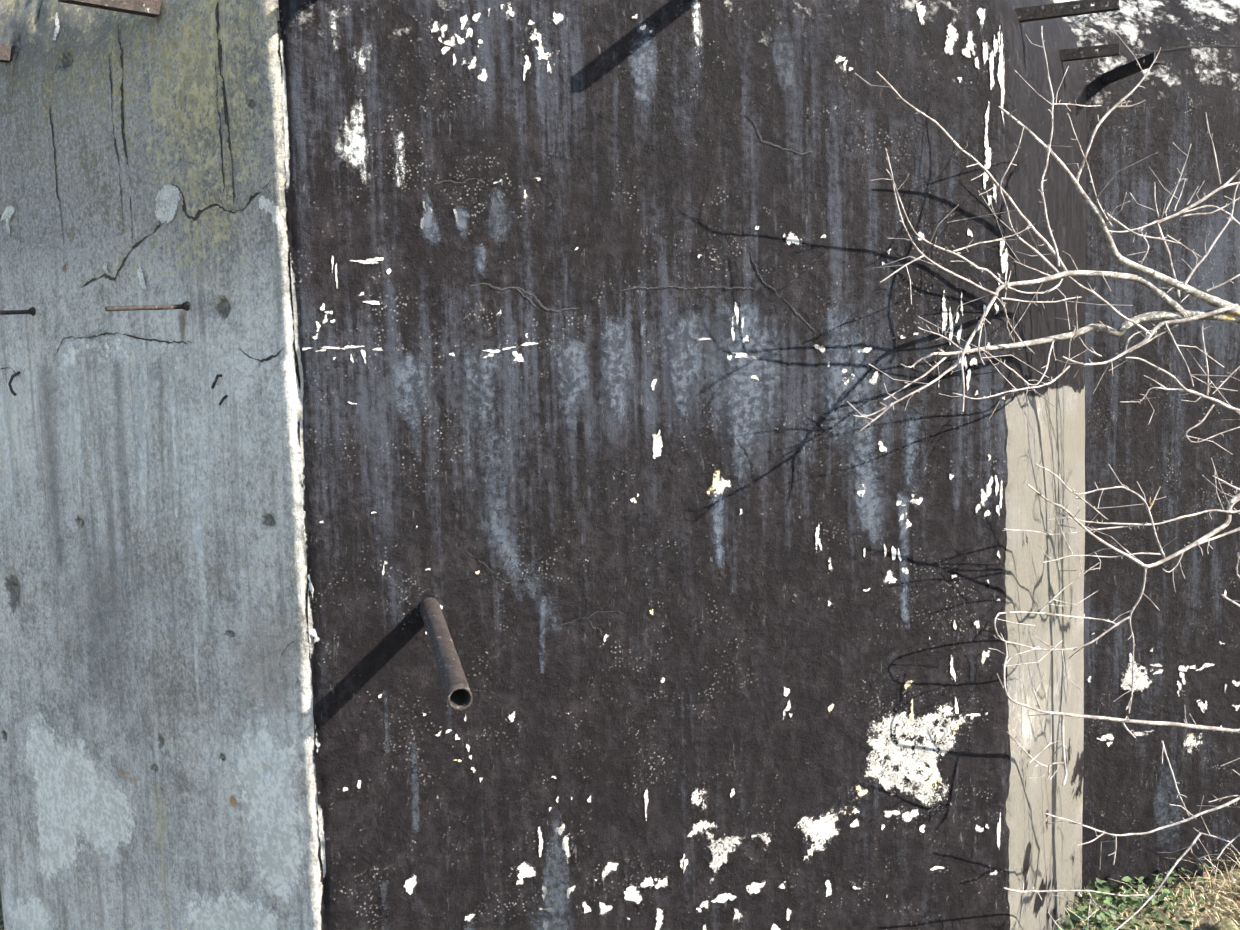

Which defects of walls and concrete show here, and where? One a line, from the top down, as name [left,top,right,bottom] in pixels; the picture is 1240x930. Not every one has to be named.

crack [81,2,272,294]
crack [49,104,64,251]
crack [55,332,191,355]
crack [239,347,284,362]
peeling [707,470,731,496]
peeling [976,475,1003,517]
peeling [884,544,908,583]
peeling [794,680,988,860]
peeling [404,874,417,895]
peeling [516,827,545,910]
peeling [567,877,667,915]
peeling [687,789,785,930]